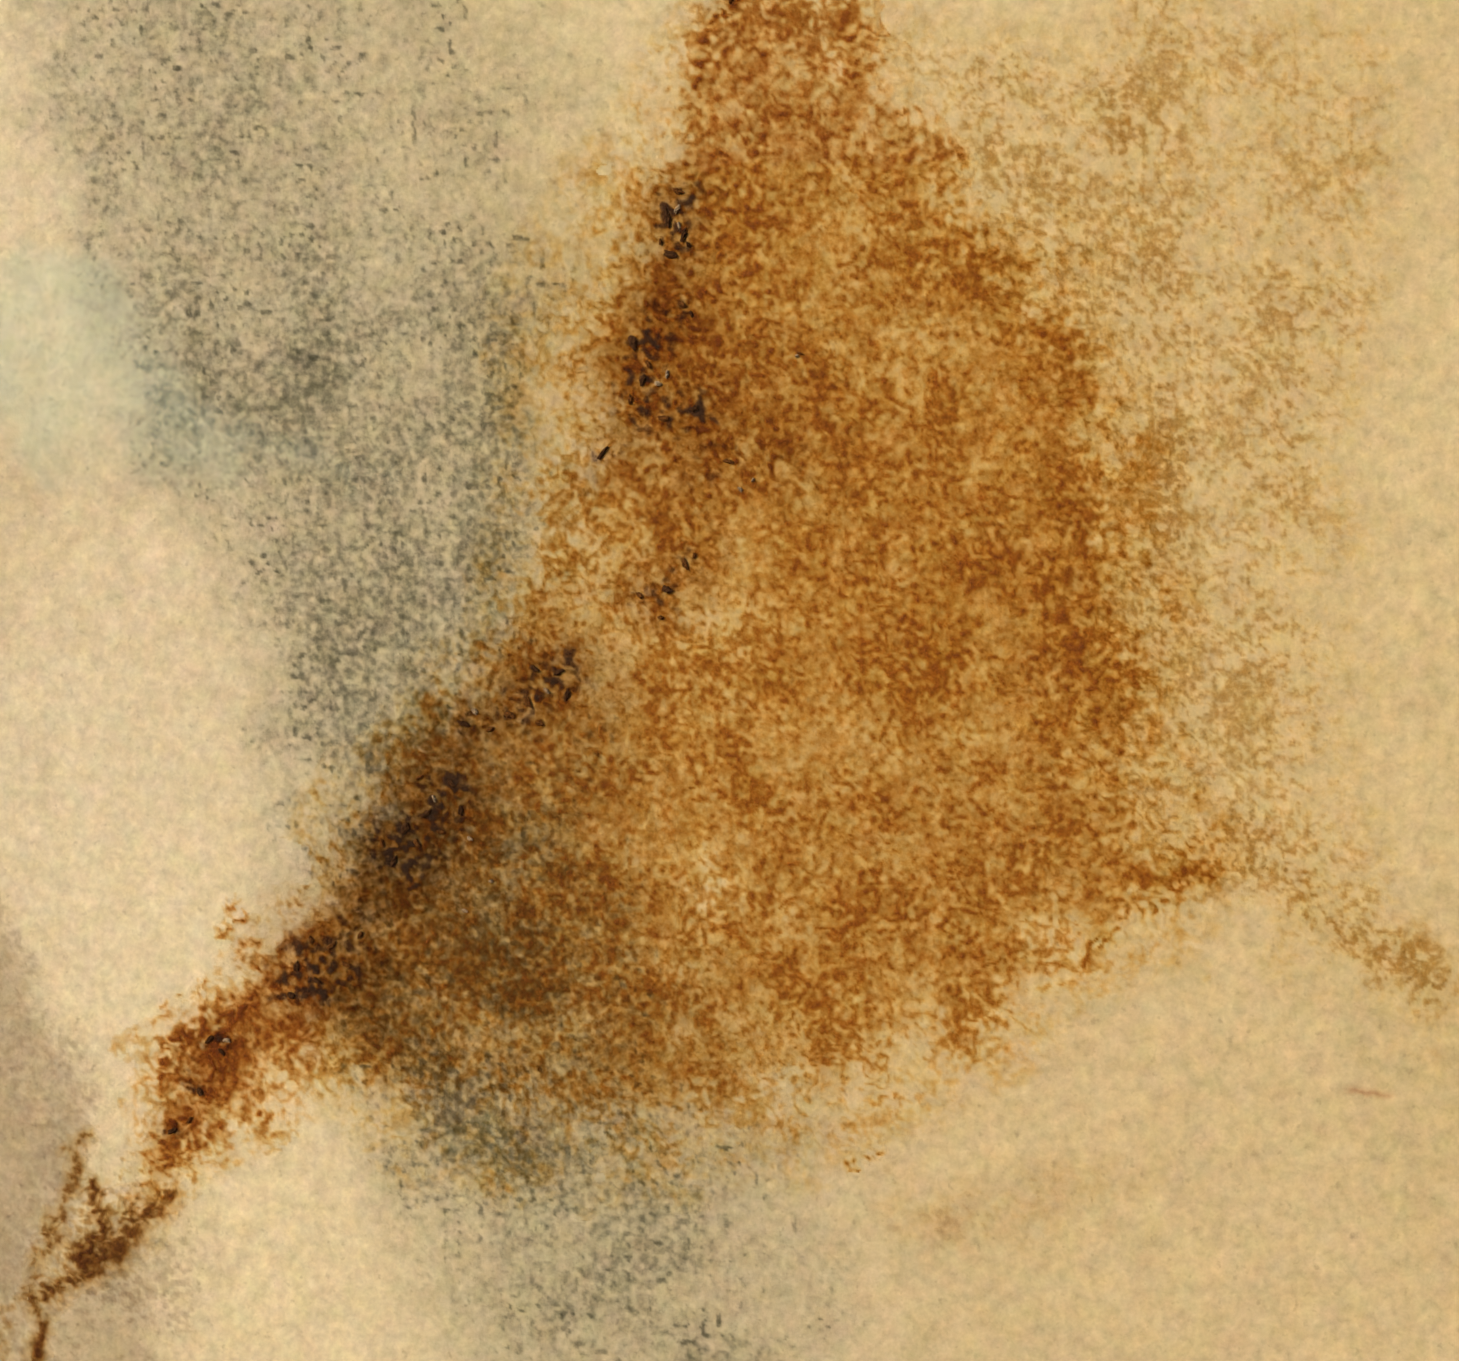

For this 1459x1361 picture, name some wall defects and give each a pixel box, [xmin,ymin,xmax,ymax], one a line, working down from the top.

corrosion [144,0,1215,1171]